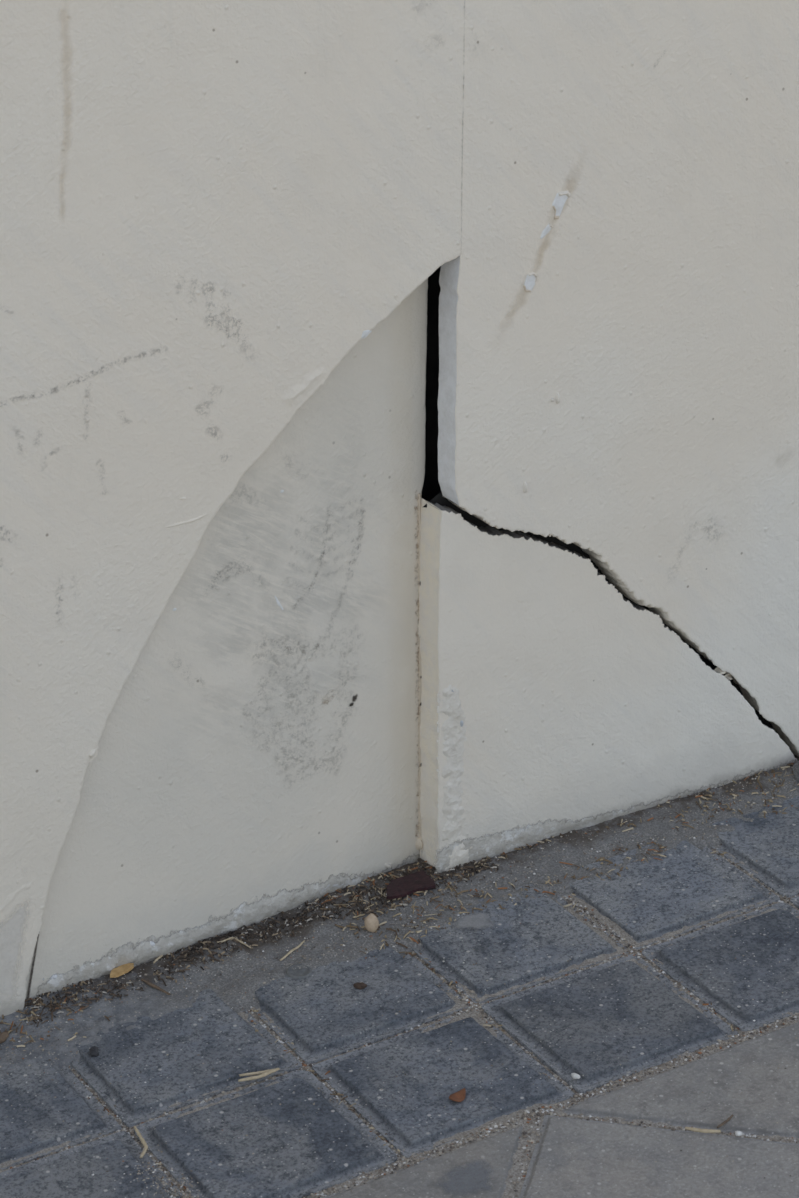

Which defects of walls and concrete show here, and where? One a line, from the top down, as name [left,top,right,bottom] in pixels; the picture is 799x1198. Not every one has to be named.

crack [422,266,799,757]